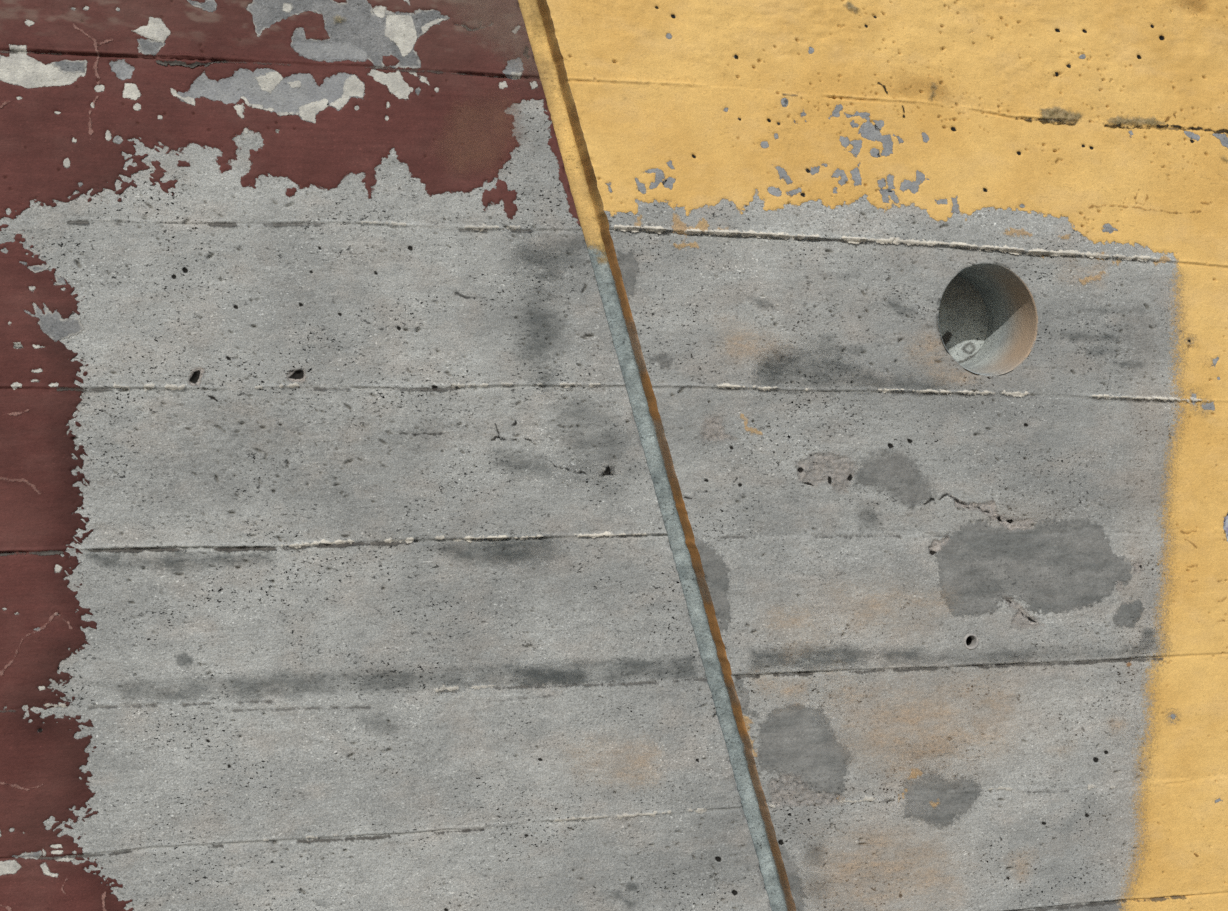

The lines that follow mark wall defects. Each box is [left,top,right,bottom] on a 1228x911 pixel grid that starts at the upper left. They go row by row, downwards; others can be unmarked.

peeling [0,44,87,100]
peeling [109,60,141,110]
peeling [132,17,170,56]
peeling [171,0,450,134]
rust [568,108,583,139]
rust [600,221,636,330]
rust [640,366,662,427]
rust [667,468,705,580]
crack [924,493,1012,523]
crack [0,612,72,675]
rust [703,598,761,785]
peeling [0,844,76,877]